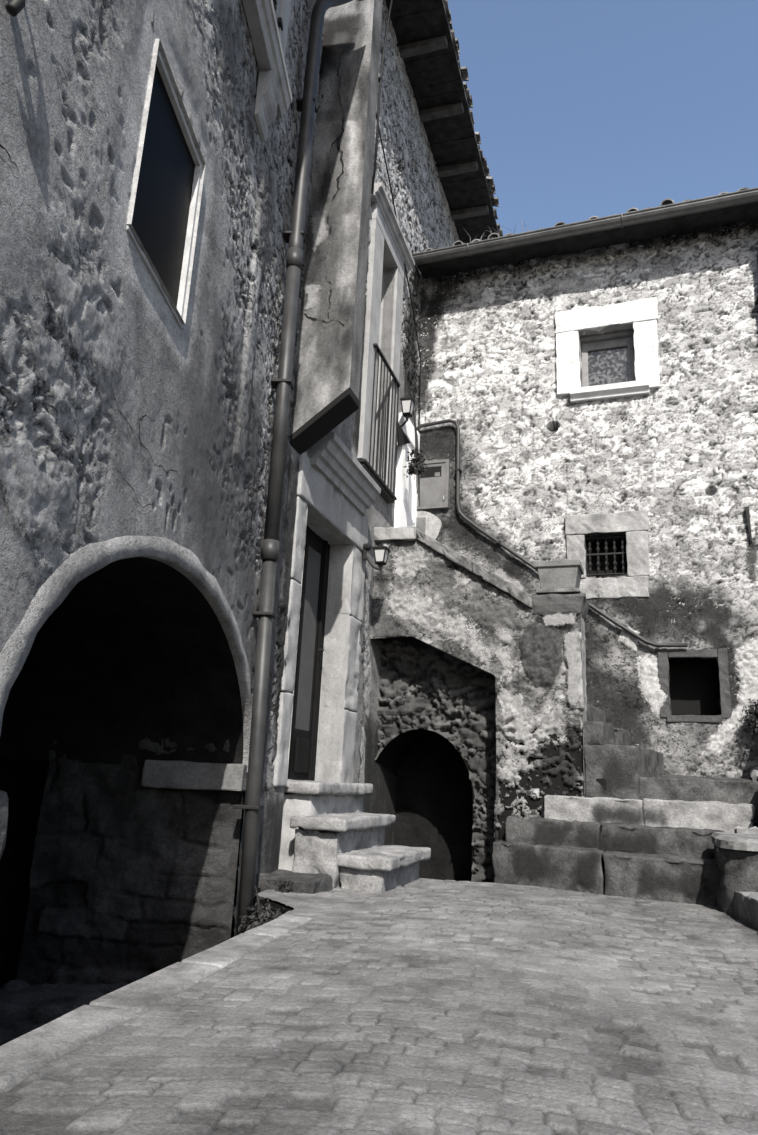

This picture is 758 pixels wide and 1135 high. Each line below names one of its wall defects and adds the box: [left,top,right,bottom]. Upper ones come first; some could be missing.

crack [304,52,345,326]
crack [109,376,180,477]